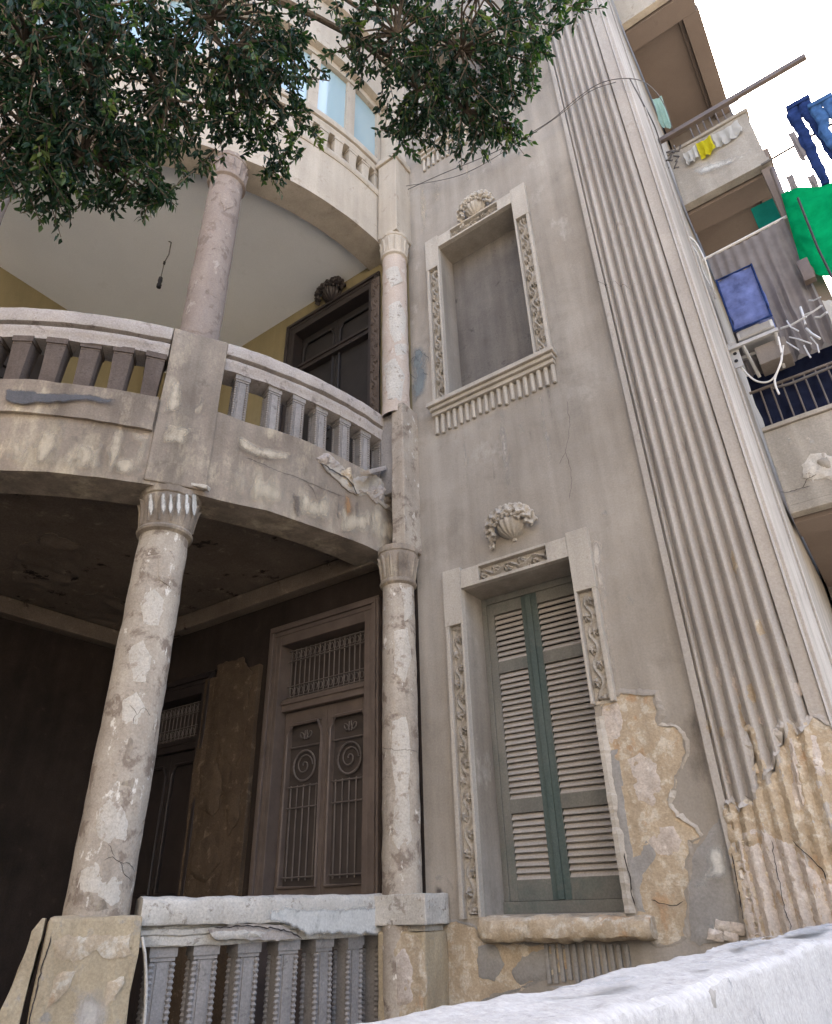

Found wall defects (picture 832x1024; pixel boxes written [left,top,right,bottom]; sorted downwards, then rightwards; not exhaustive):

spalling [801,453,832,481]
peeling [140,551,180,626]
spalling [755,619,766,636]
peeling [122,641,152,725]
peeling [95,799,128,844]
peeling [595,688,703,948]
peeling [707,663,832,943]
peeling [77,862,122,911]
crack [28,938,51,1024]
peeling [443,919,567,1006]